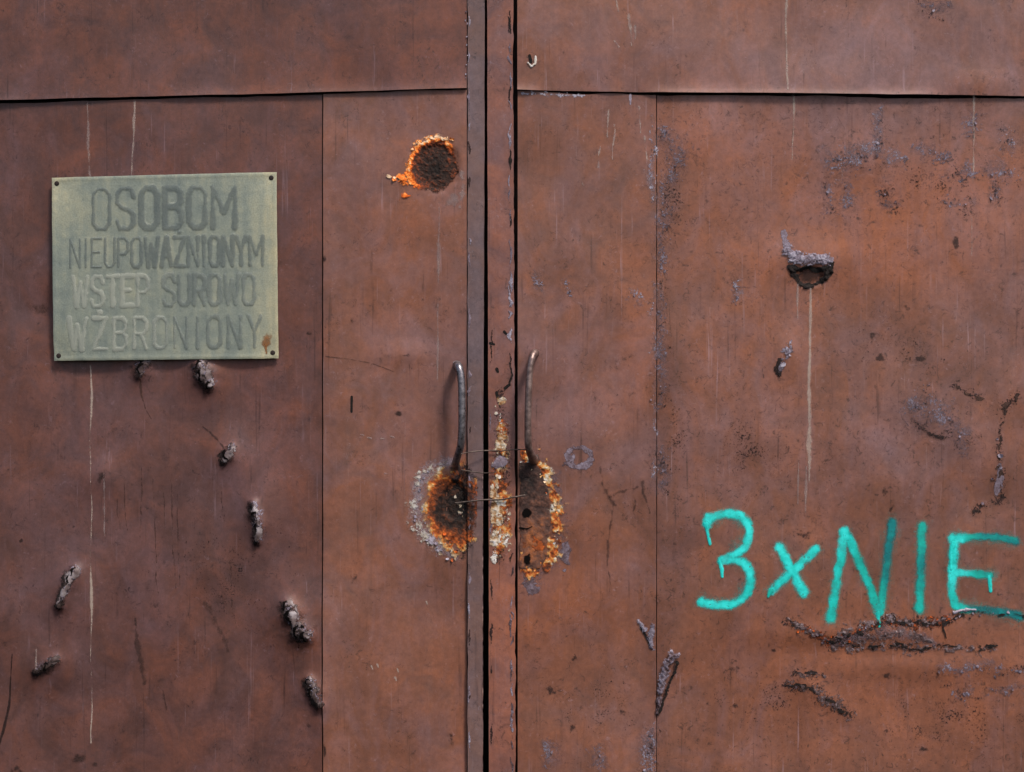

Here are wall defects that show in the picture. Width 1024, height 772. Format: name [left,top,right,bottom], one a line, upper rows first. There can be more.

corrosion [409,387,545,564]